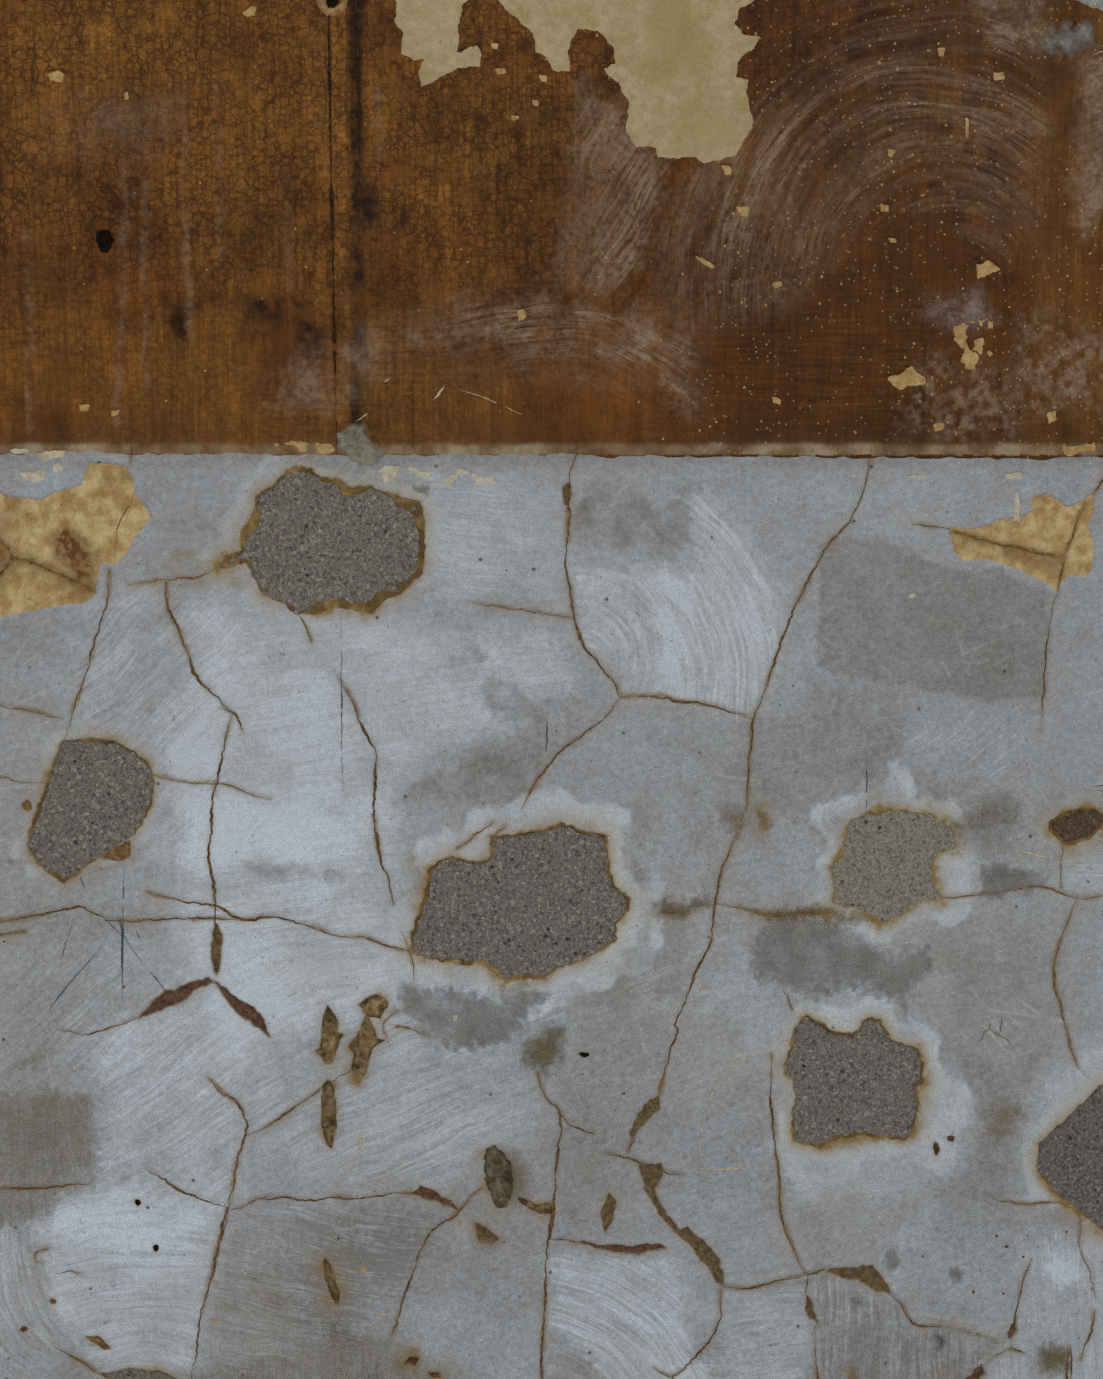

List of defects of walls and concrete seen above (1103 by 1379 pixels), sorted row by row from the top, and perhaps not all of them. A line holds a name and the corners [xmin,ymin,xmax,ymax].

peeling [395,0,506,87]
peeling [499,0,760,175]
peeling [0,448,151,617]
flaking render [220,467,426,614]
crack [1041,592,1059,733]
crack [0,567,415,1037]
flaking render [411,822,630,983]
crack [459,447,1031,1379]
crack [941,847,1100,1070]
flaking render [784,1017,924,1149]
crack [150,1070,480,1376]
crack [991,1198,1095,1379]